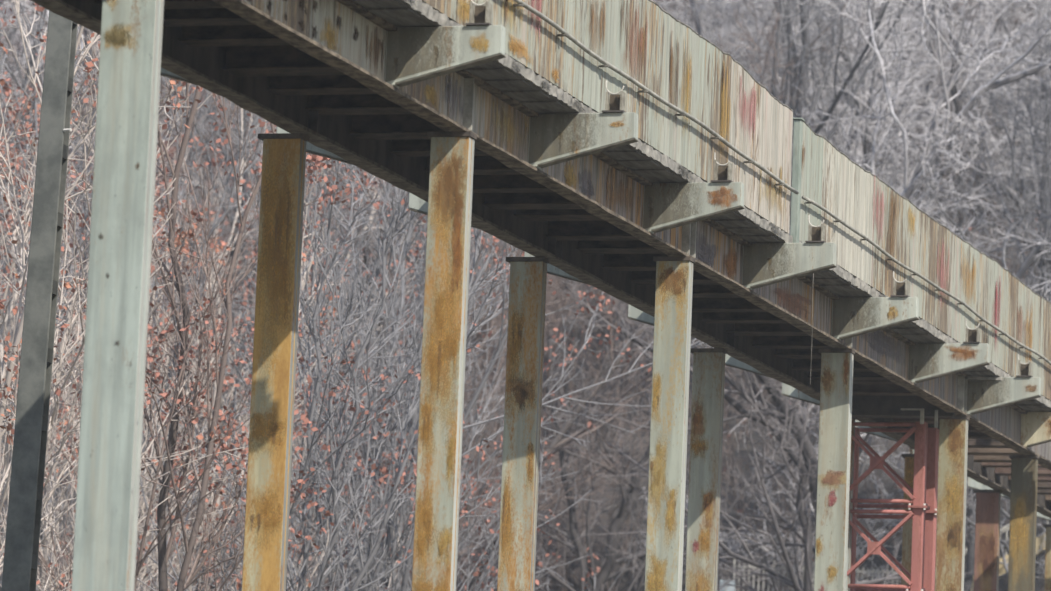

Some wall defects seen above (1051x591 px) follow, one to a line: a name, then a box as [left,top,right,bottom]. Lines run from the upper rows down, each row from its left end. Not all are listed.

rust [105,25,132,48]
rust [367,27,451,82]
rust [505,0,529,60]
rust [670,37,692,119]
rust [708,187,737,207]
rust [419,157,466,458]
rust [908,326,991,380]
rust [413,495,452,591]
rust [446,440,455,489]
rust [500,482,512,569]
rust [650,445,676,542]
rust [942,477,962,558]